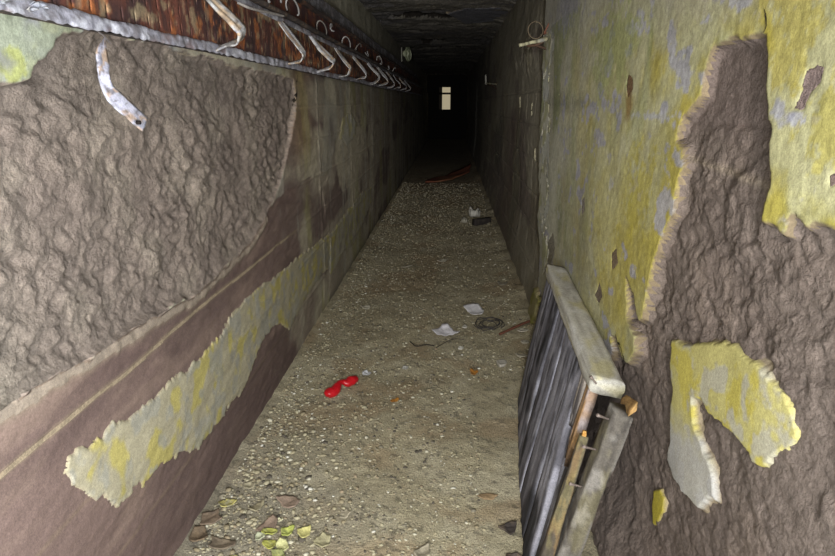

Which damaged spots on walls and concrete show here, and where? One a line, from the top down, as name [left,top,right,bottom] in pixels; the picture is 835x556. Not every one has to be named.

crack [393,11,452,19]
spalling [0,30,336,556]
spalling [576,38,835,556]